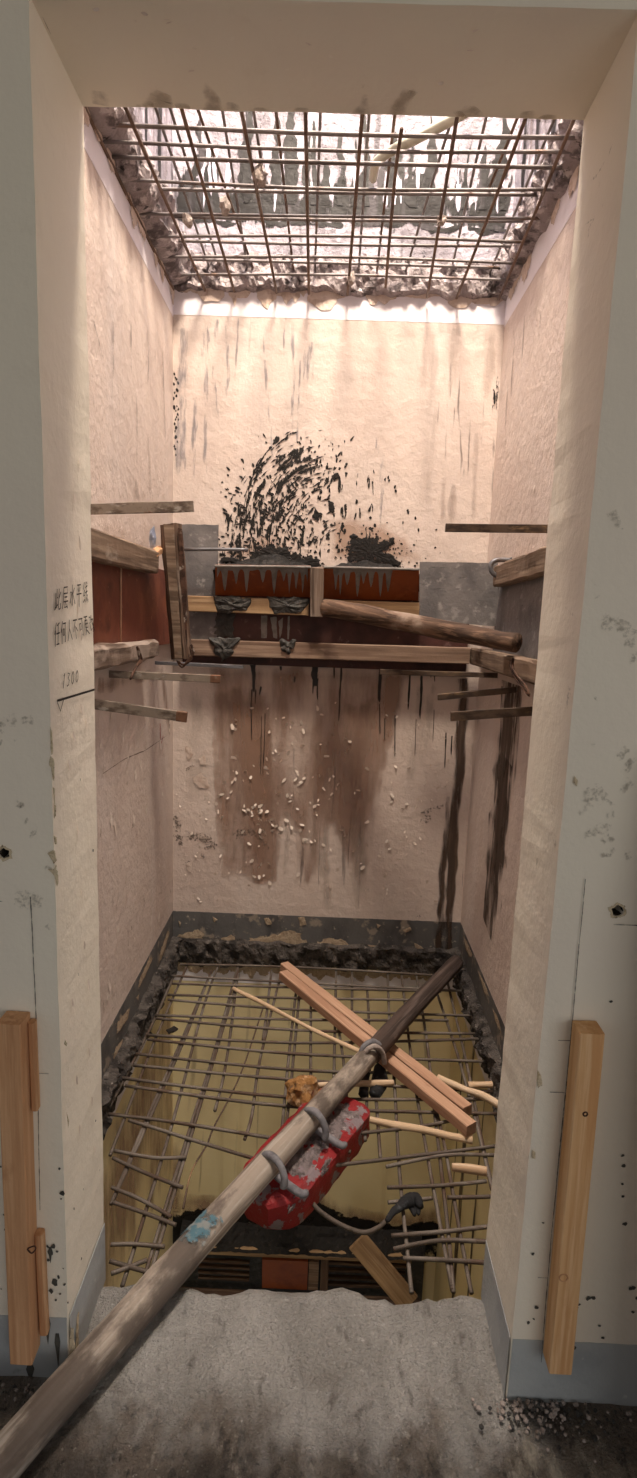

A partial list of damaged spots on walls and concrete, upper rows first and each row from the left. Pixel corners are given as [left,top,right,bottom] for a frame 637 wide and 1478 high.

spalling [83,107,584,311]
water stain [339,525,390,552]
water stain [173,665,468,950]
water stain [483,682,521,939]